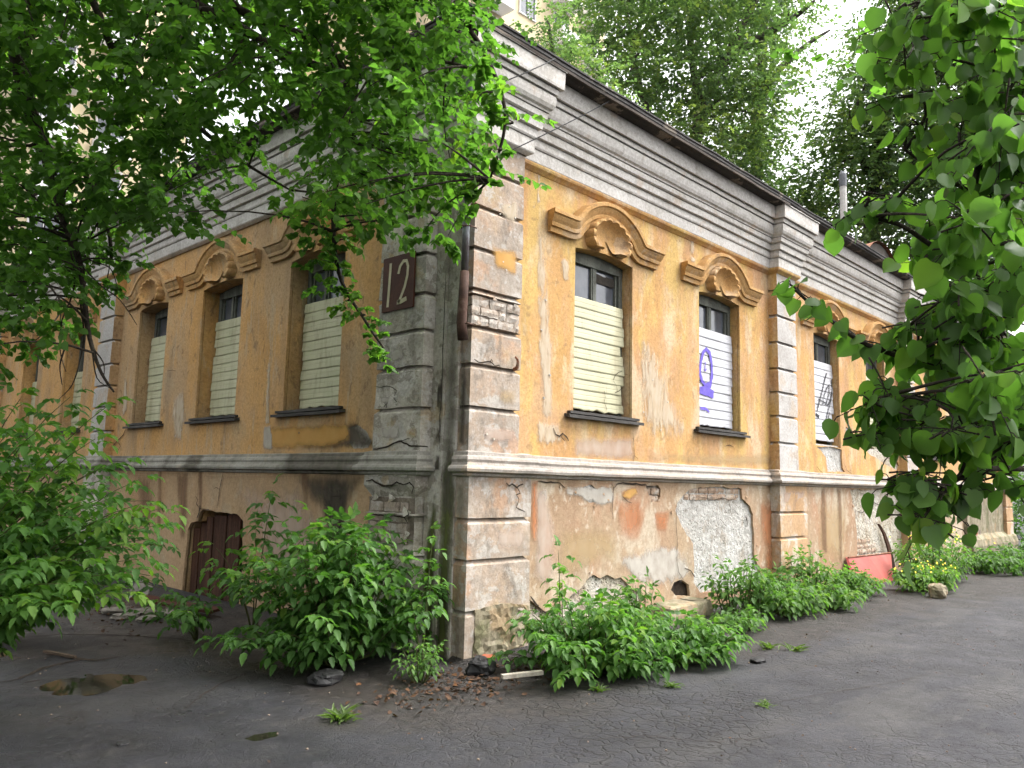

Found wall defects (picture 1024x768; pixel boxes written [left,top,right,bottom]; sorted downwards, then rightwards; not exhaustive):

peeling [500,203,517,221]
peeling [496,251,516,273]
flaking render [468,295,520,334]
crack [374,278,446,450]
leakage [288,425,373,545]
crack [366,479,414,523]
crack [506,481,565,512]
peeling [559,485,659,507]
flaking render [671,487,760,596]
flaking render [850,489,902,566]
flaking render [472,570,639,657]